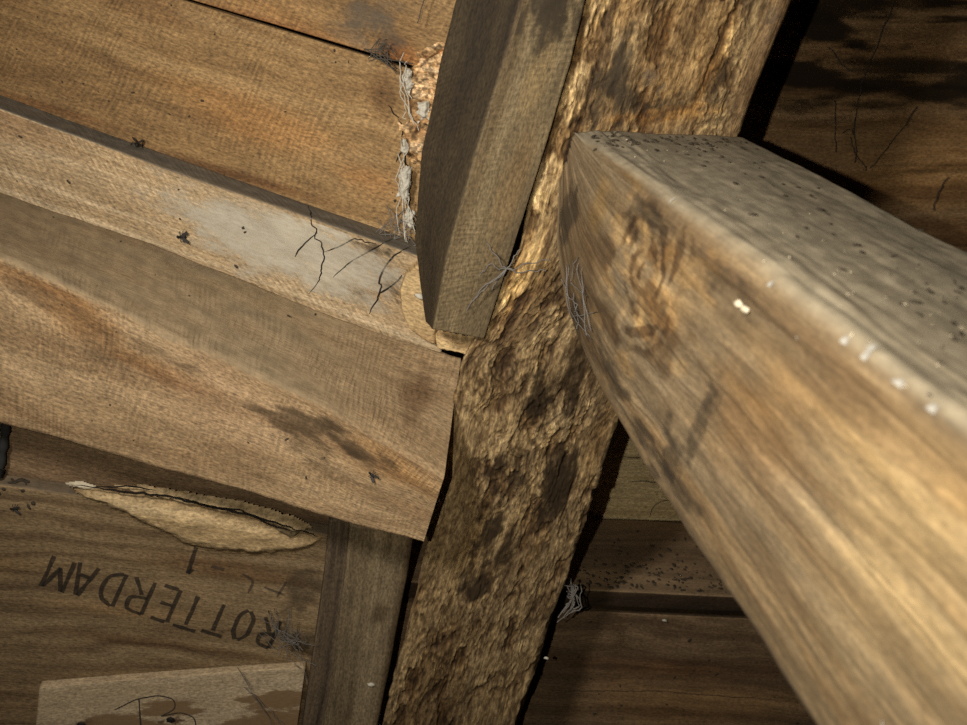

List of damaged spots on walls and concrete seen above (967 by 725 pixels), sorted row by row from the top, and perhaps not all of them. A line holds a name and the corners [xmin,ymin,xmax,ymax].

water stain [763,0,967,117]
crack [295,208,408,314]
water stain [525,346,588,423]
water stain [485,454,524,488]
water stain [537,441,578,528]
water stain [457,502,513,601]